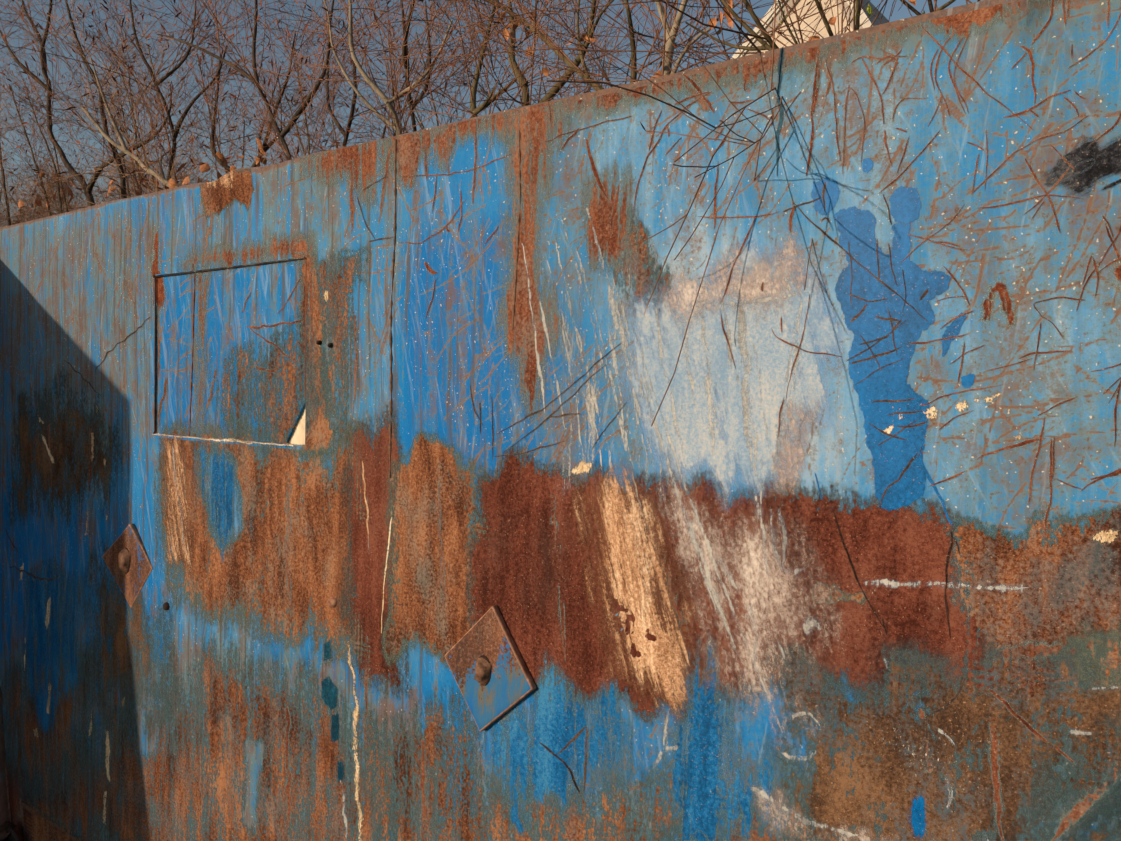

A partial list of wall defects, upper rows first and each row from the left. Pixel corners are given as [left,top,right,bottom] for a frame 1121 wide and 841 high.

corrosion [9,169,1121,841]
corrosion [299,0,1057,418]